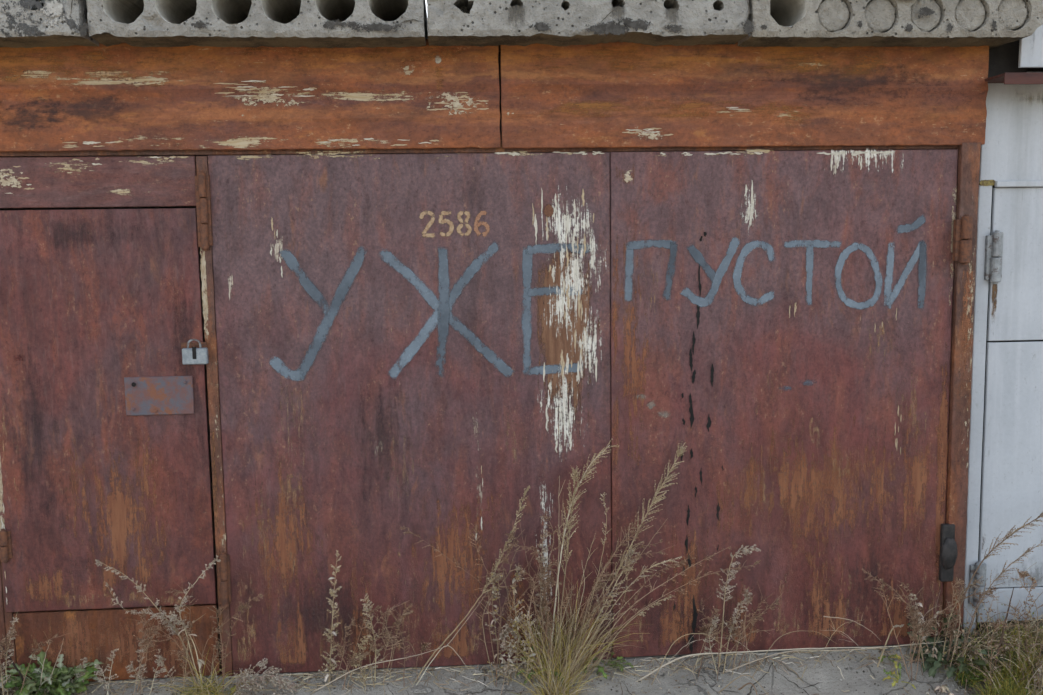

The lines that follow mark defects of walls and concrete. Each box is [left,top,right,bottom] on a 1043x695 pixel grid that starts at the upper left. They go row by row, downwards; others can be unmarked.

peeling [14,70,182,86]
peeling [44,136,188,175]
peeling [195,136,288,160]
peeling [213,71,414,116]
peeling [817,149,904,175]
peeling [532,182,607,462]
corrosion [949,187,976,386]
corrosion [26,439,199,678]
corrosion [235,464,323,666]
corrosion [660,531,707,646]
corrosion [774,538,861,640]
corrosion [880,368,948,637]